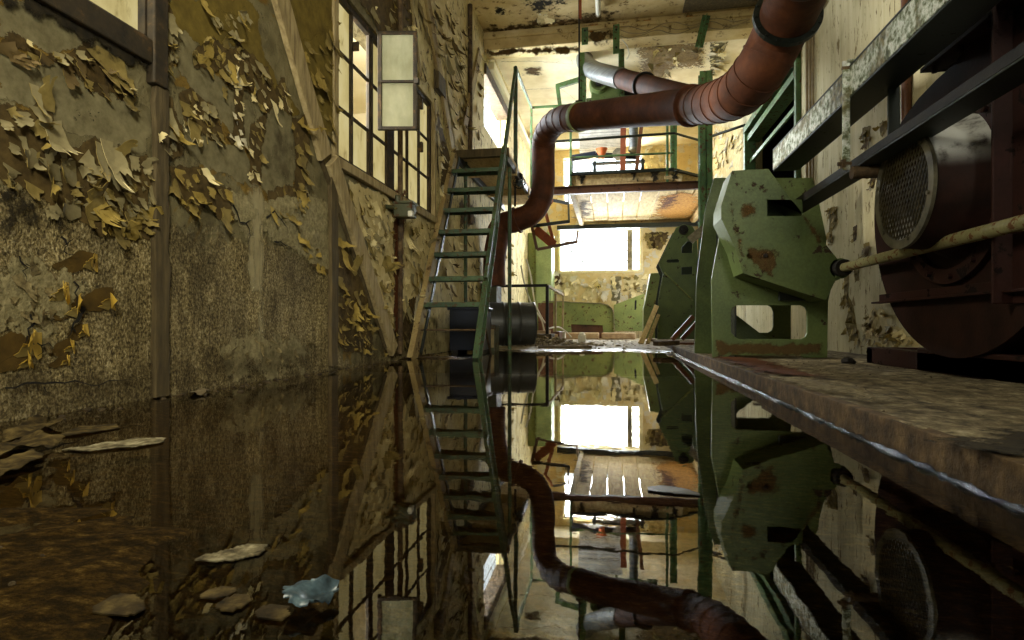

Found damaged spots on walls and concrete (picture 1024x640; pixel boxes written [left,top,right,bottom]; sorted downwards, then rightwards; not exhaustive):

peeling [537,12,555,25]
peeling [859,120,887,151]
peeling [0,0,487,373]
peeling [825,206,838,245]
peeling [839,225,919,349]